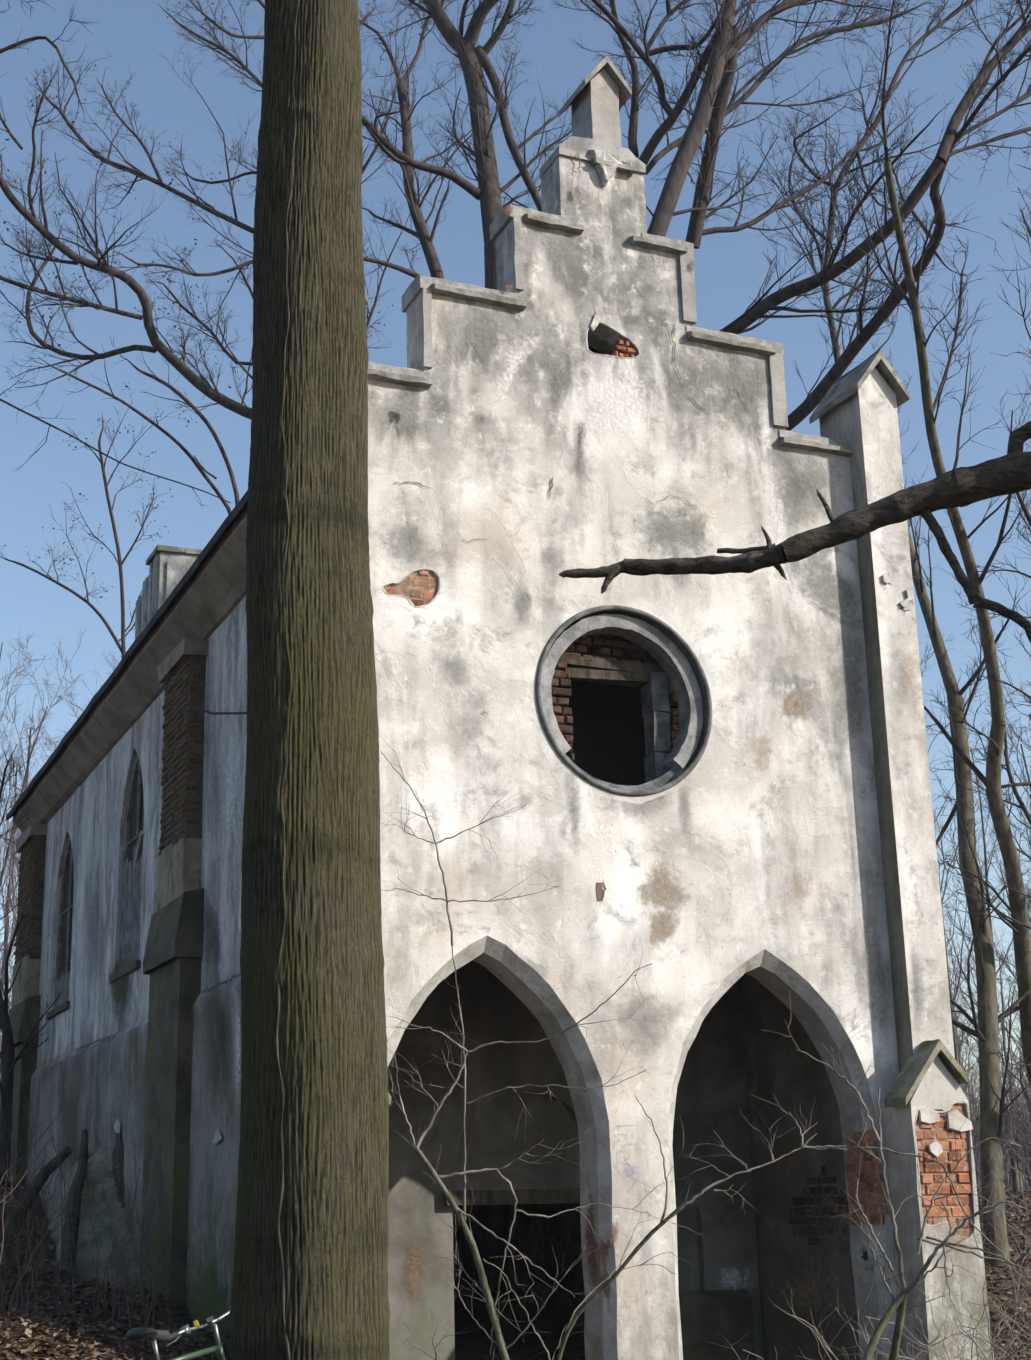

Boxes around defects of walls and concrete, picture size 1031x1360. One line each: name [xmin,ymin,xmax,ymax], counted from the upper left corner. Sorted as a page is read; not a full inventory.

spalling [585,314,641,359]
spalling [382,568,441,608]
flaking render [596,882,607,902]
damp [643,864,683,942]
peeling [918,1109,973,1133]
peeling [927,1140,943,1157]